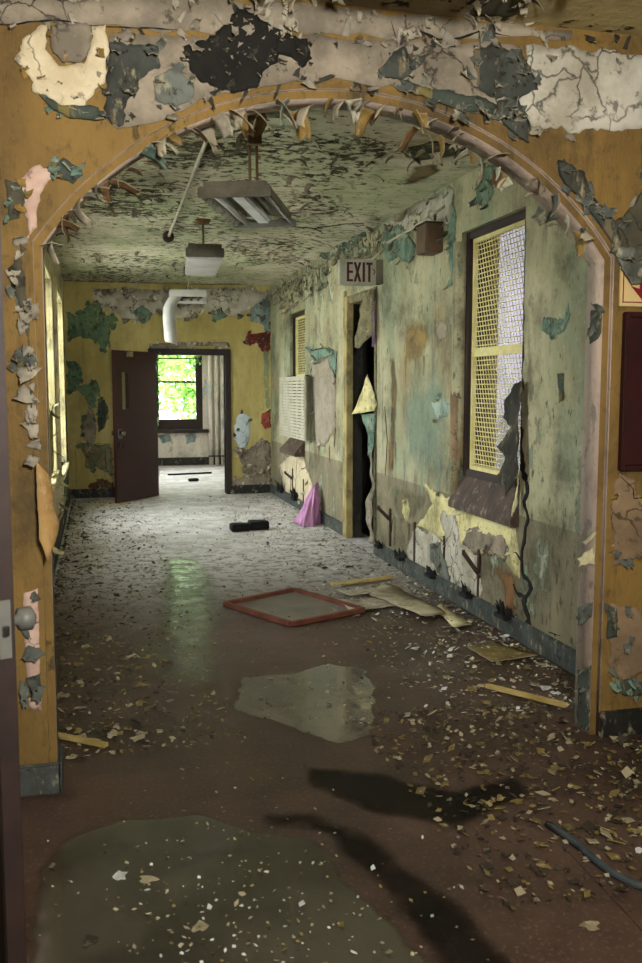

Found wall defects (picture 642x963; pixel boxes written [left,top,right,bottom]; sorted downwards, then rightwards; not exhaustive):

spalling [0,0,642,284]
spalling [2,155,115,568]
spalling [66,185,457,353]
peeling [230,409,312,504]
spalling [304,343,337,447]
peeling [352,374,377,545]
spalling [399,381,523,602]
peeling [542,303,571,340]
peeling [577,532,597,566]
spalling [609,473,642,567]
spalling [19,588,46,711]
spalling [605,603,642,703]